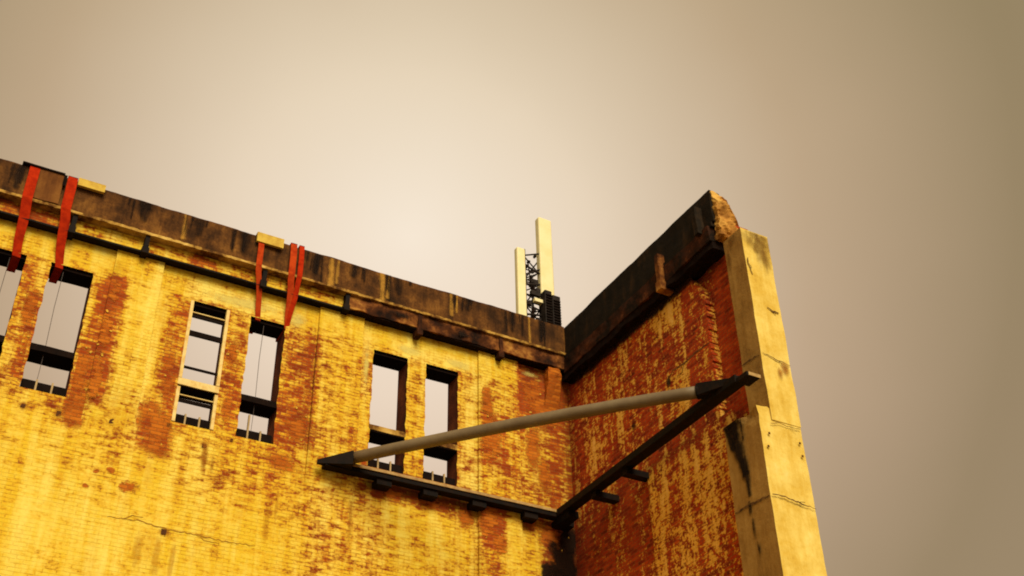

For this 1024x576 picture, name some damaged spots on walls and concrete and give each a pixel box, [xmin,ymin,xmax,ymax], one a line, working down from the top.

peeling [56,281,120,427]
peeling [136,353,176,458]
crack [107,515,254,546]
peeling [521,380,563,491]
damp [723,418,760,554]
crack [735,494,815,514]